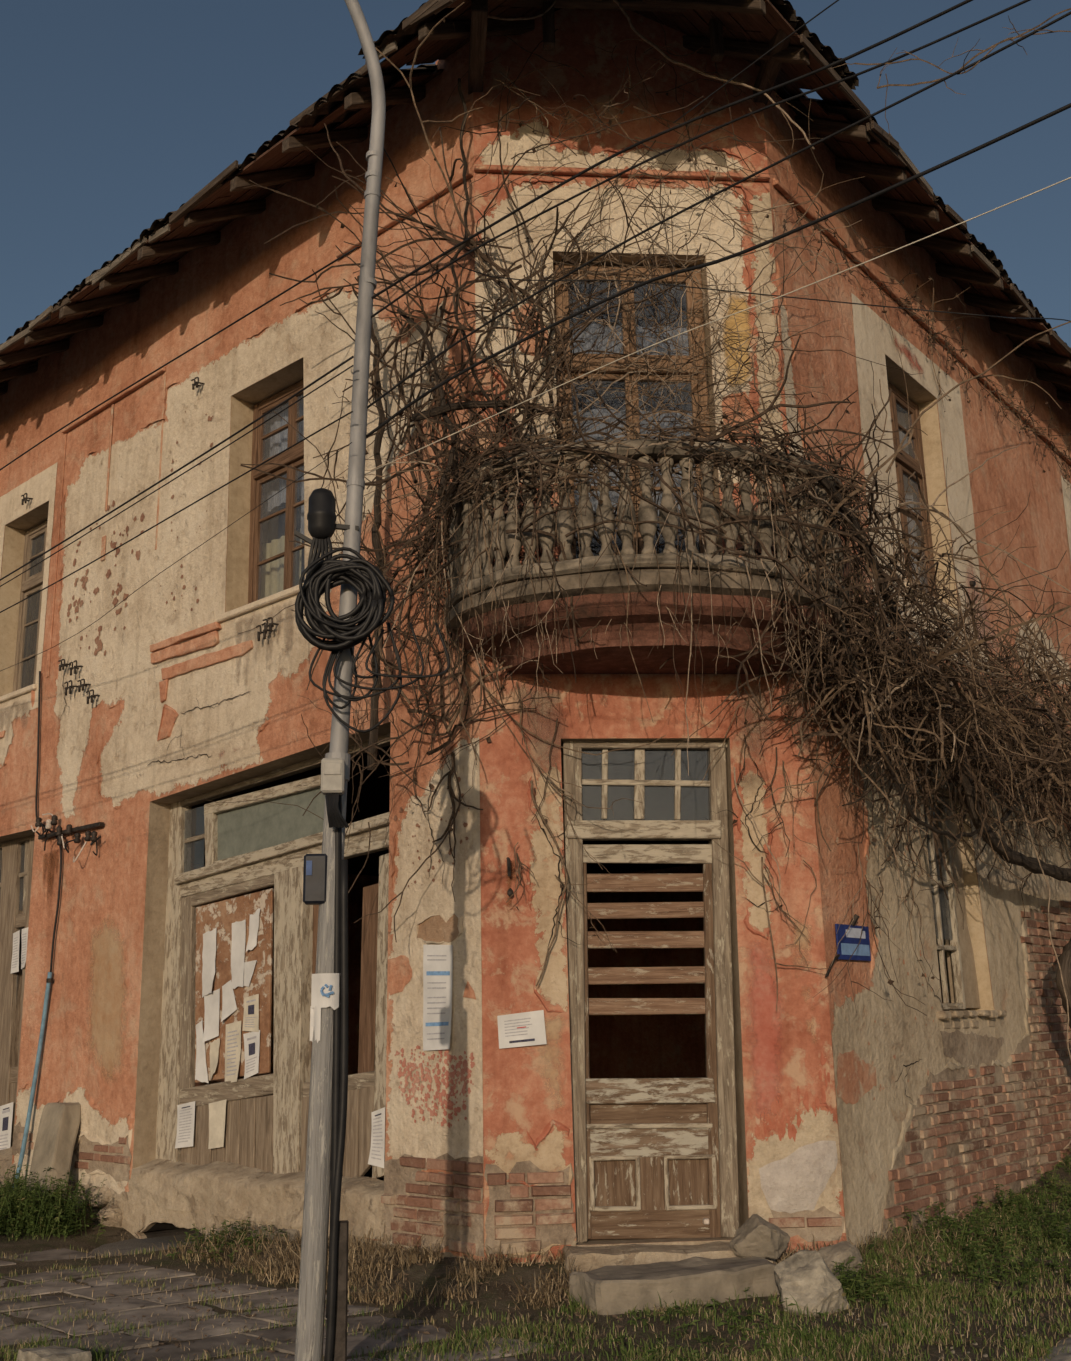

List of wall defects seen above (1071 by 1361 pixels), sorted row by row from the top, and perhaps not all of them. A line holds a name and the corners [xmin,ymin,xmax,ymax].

peeling [475,113,805,455]
peeling [0,690,35,768]
peeling [53,284,456,818]
peeling [349,735,731,1263]
peeling [747,717,1071,1247]